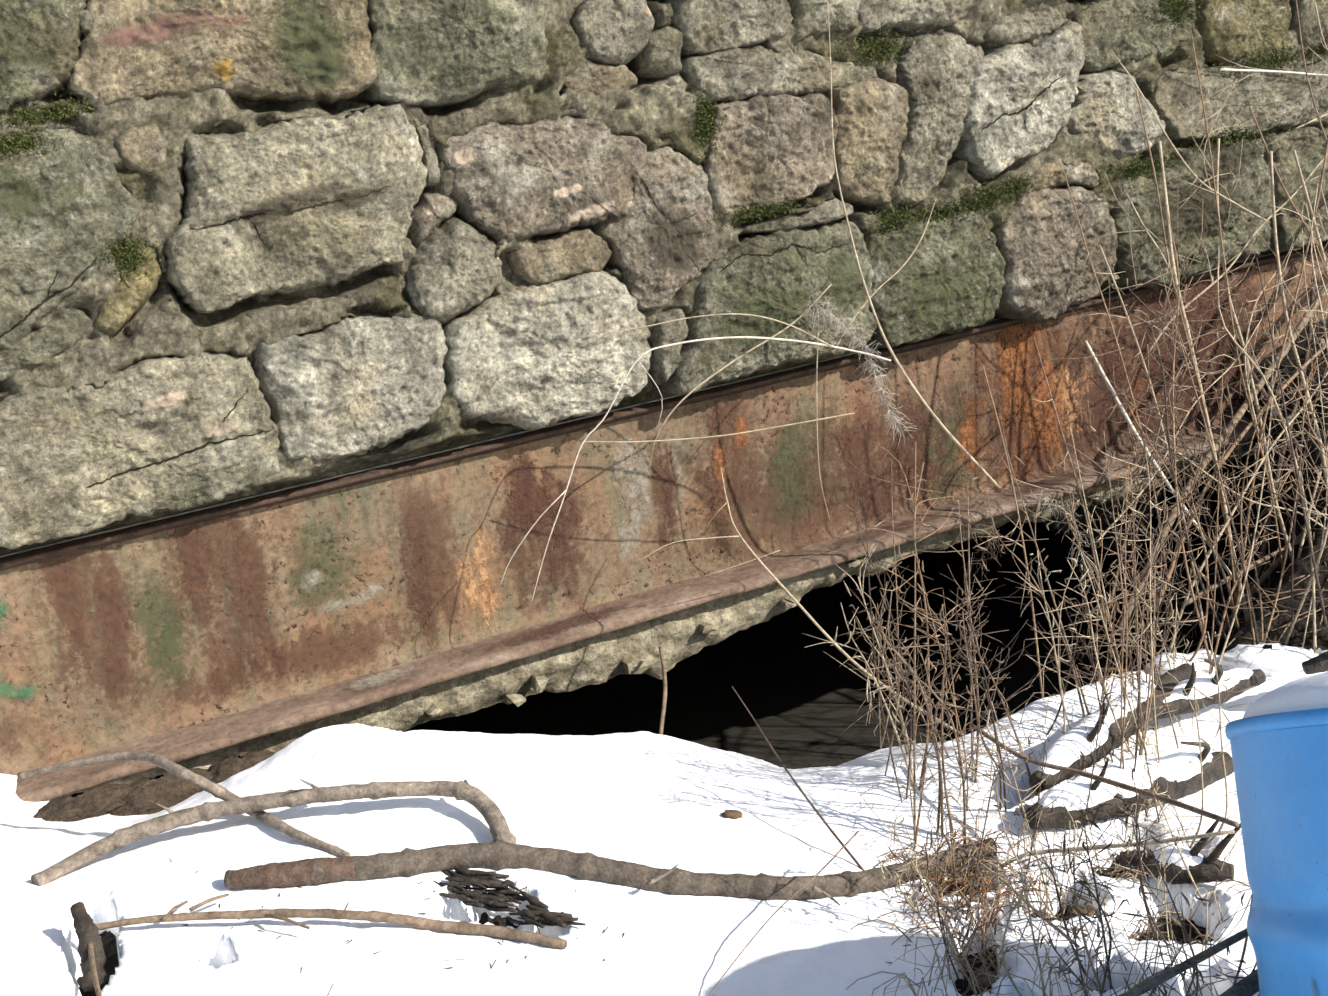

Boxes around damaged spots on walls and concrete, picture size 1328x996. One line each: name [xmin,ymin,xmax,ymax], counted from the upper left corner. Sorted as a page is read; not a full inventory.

crack [191,186,391,246]
crack [87,389,271,488]
rust [714,417,747,480]
rust [458,456,582,625]
rust [651,454,679,541]
rust [491,605,625,647]
spalling [96,439,1254,787]